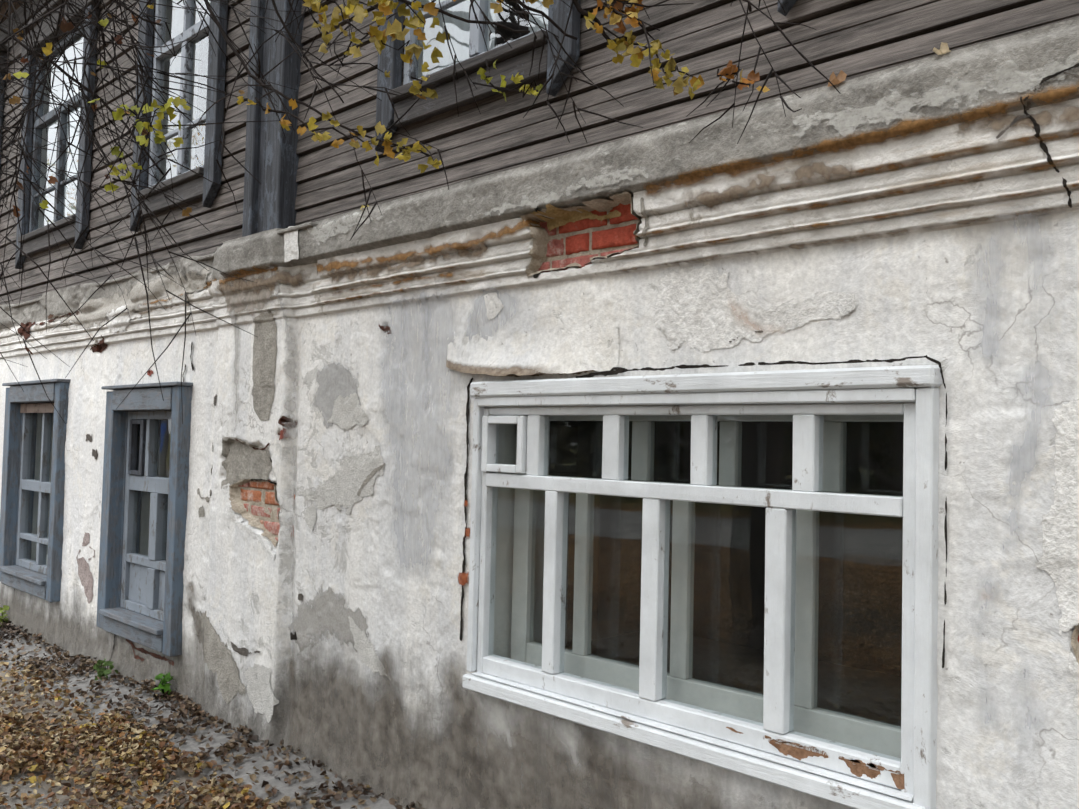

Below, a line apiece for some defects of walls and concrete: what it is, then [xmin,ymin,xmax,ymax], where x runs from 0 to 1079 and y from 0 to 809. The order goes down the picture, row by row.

crack [996,63,1079,208]
flaking render [479,166,649,278]
flaking render [197,309,385,560]
crack [576,355,948,471]
peeling [289,586,391,681]
crack [940,497,948,668]
peeling [1035,400,1079,716]
damp [289,656,722,809]
peeling [765,735,905,790]